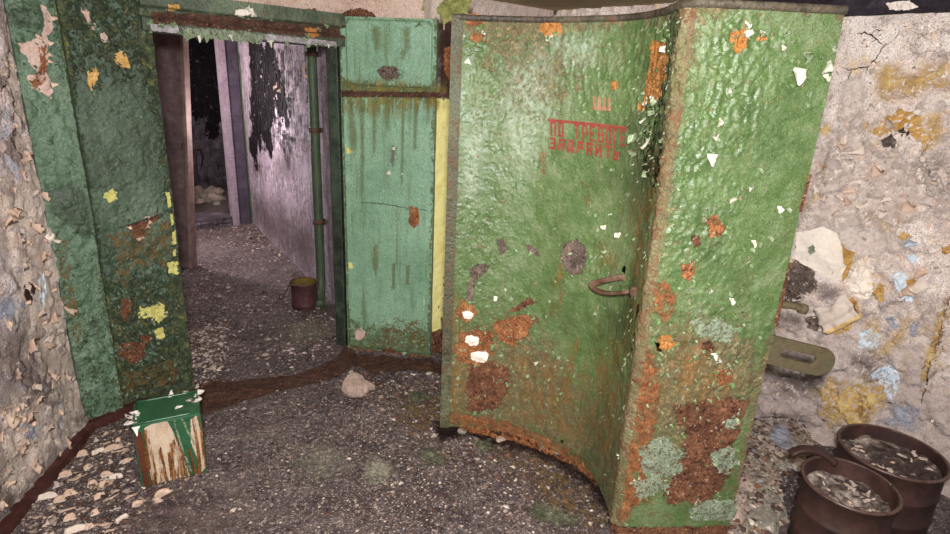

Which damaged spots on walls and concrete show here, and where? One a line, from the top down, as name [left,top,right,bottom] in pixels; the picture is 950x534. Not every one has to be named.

corrosion [151,4,376,40]
corrosion [637,38,670,112]
crack [842,29,898,79]
peeling [0,0,189,511]
corrosion [127,214,160,242]
spalling [777,55,950,429]
corrosion [348,264,750,534]